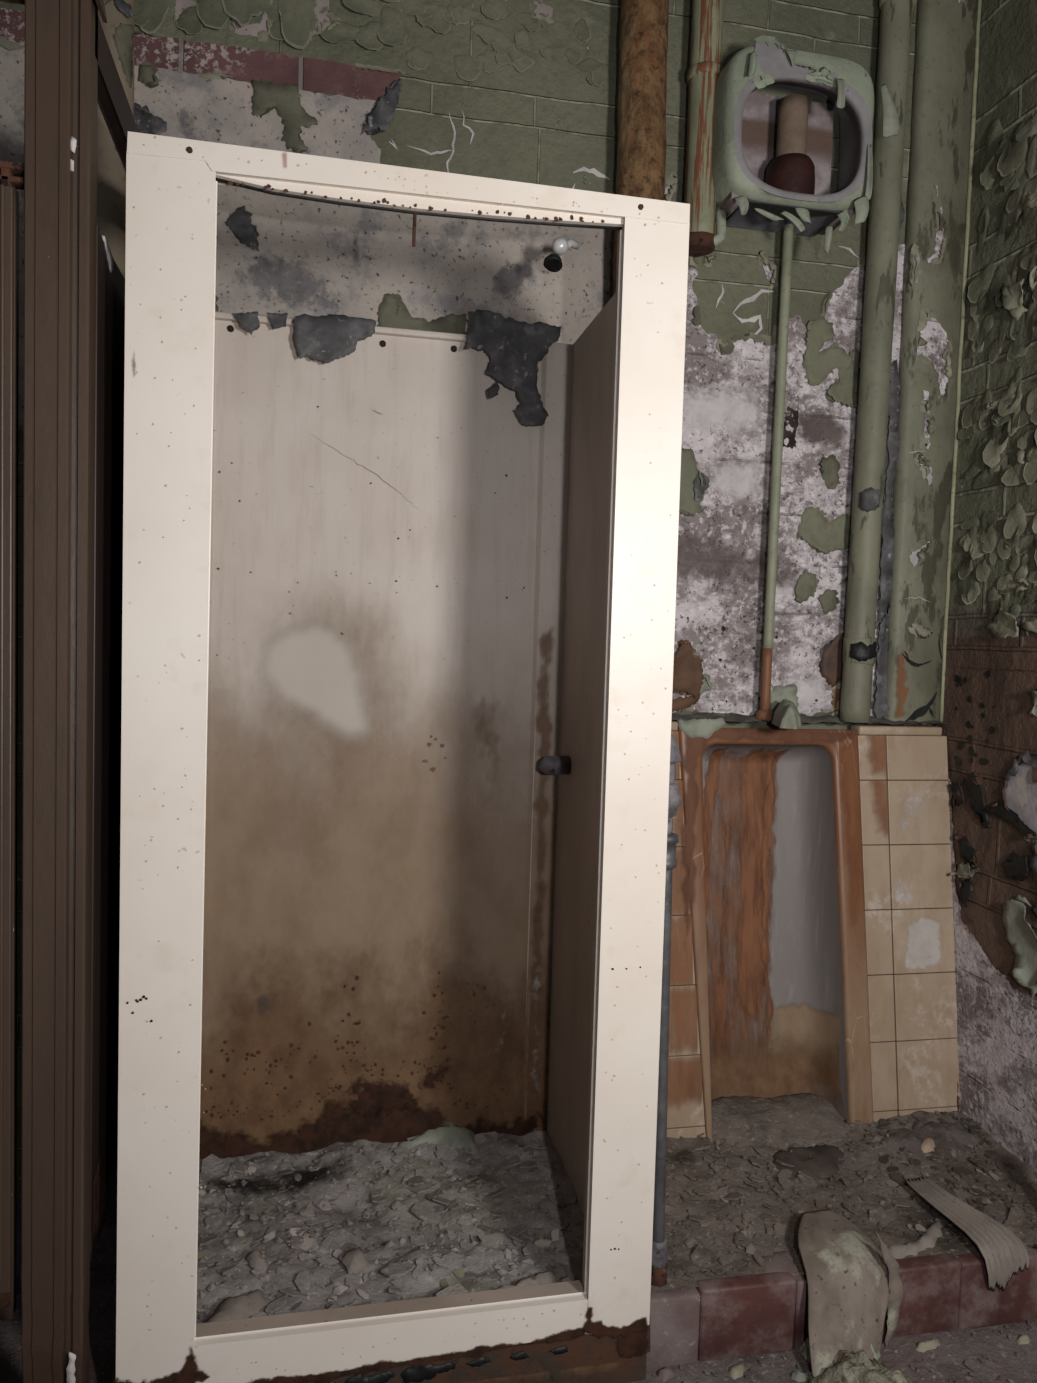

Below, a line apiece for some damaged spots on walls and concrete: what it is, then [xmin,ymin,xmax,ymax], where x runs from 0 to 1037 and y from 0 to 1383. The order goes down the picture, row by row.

peeling [0,8,25,163]
peeling [113,0,405,164]
peeling [215,184,613,344]
peeling [664,171,680,202]
peeling [890,184,953,486]
peeling [1028,266,1037,292]
peeling [672,250,893,717]
peeling [991,750,1037,854]
rust [643,728,889,1103]
peeling [947,777,1037,1177]
rust [114,1339,210,1383]
rust [237,1307,648,1383]